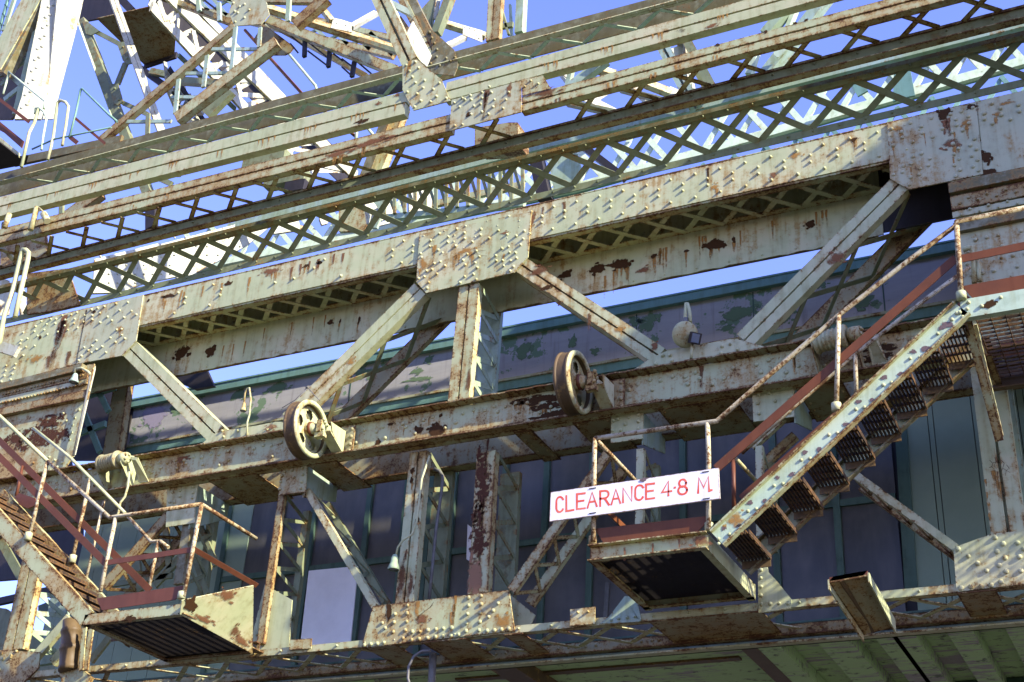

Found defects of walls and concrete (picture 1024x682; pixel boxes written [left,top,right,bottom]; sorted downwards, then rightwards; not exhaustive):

rust [936,104,978,164]
rust [981,150,997,175]
rust [684,231,741,267]
rust [587,247,667,288]
peeling [626,310,662,333]
peeling [717,304,759,331]
rust [27,314,71,367]
rust [3,412,71,451]
peeling [138,403,179,430]
rust [387,413,447,436]
rust [468,439,492,562]
rust [184,595,216,626]